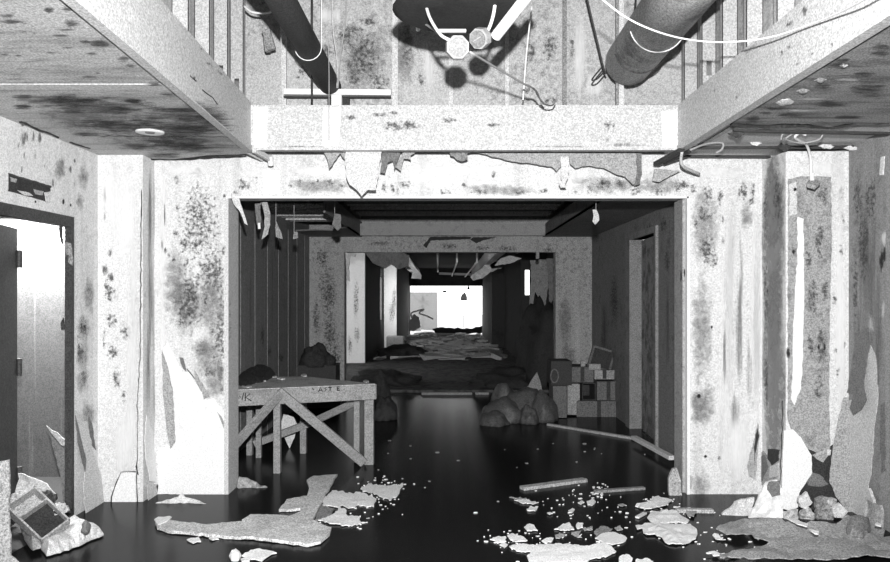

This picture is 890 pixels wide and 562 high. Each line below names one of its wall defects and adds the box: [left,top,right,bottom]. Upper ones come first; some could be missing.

water stain [15,95,229,158]
peeling [75,415,96,471]
crack [111,190,142,502]
flaking render [147,343,224,504]
water stain [164,185,231,393]
peeling [789,182,805,405]
flaking render [747,327,886,527]